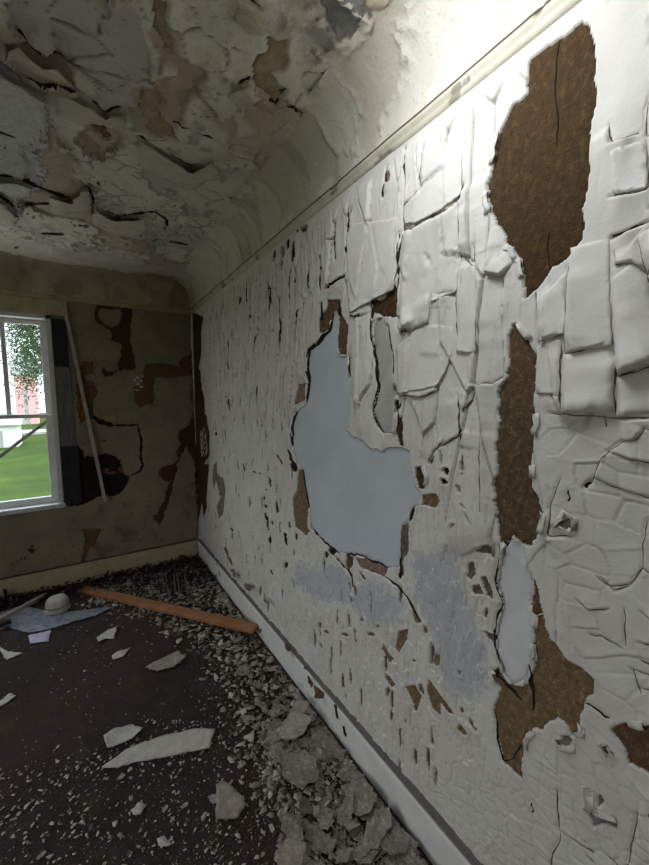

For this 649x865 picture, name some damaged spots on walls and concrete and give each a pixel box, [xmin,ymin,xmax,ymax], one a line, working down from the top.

peeling [0,42,126,227]
crack [608,103,649,142]
crack [381,148,434,290]
crack [612,222,649,282]
spalling [69,447,129,506]
peeling [79,305,225,528]
peeling [274,139,477,602]
peeling [468,23,614,777]
crack [537,232,649,693]
crack [493,545,535,711]
crack [550,790,649,865]
peeling [613,719,649,772]